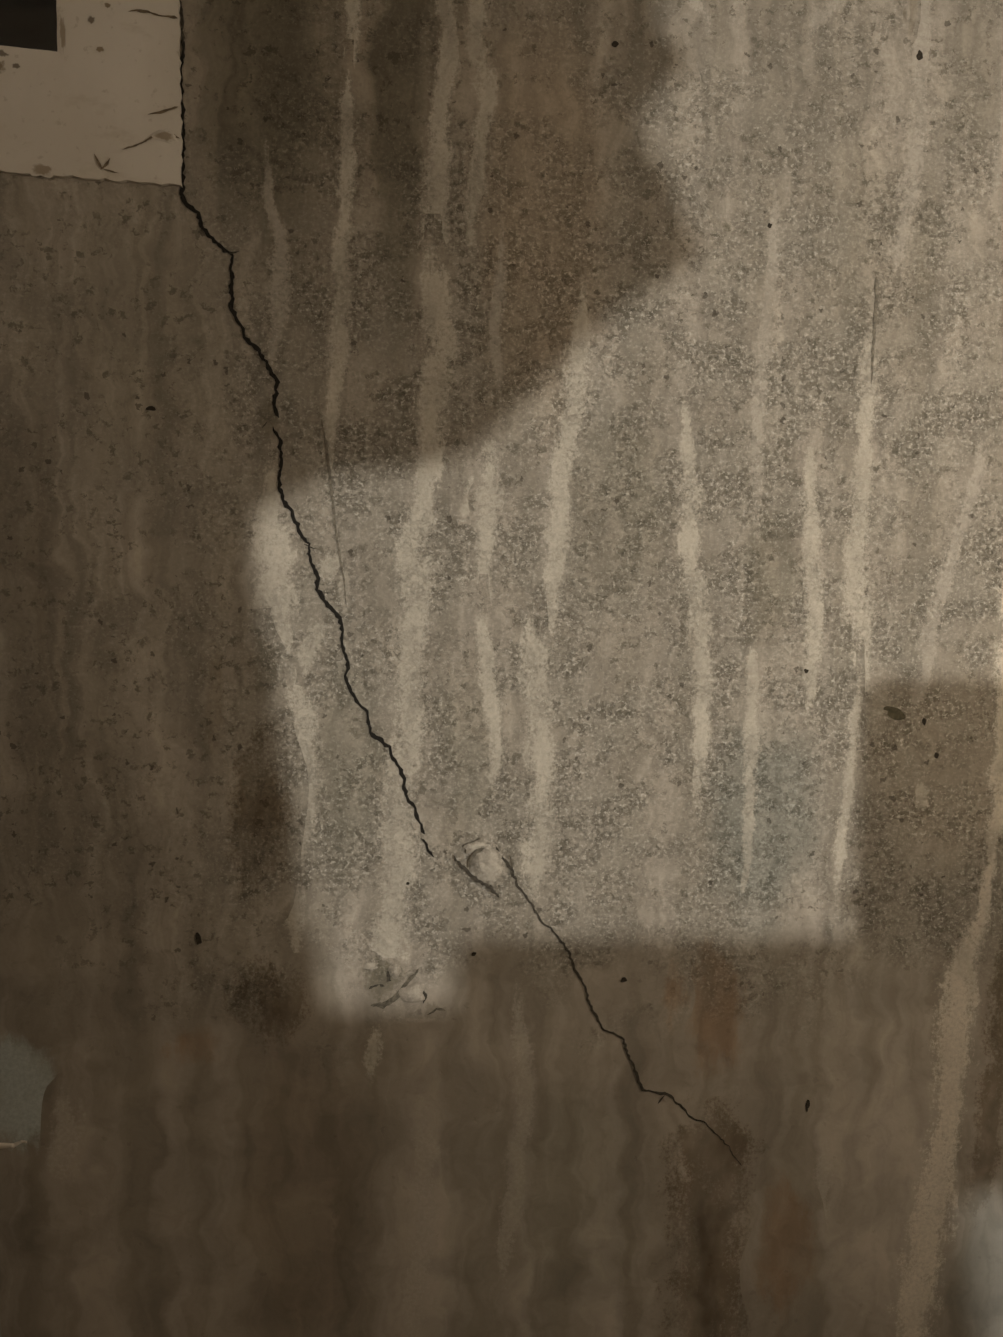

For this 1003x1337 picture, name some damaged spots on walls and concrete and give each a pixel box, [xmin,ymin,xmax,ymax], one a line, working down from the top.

water stain [0,1020,93,1200]
water stain [190,0,366,1064]
crack [179,0,742,1166]
water stain [353,0,603,1337]
water stain [626,1071,787,1337]
efflorescence [669,365,768,907]
water stain [743,152,784,594]
water stain [795,0,946,941]
water stain [879,507,1003,1337]
water stain [904,406,991,815]